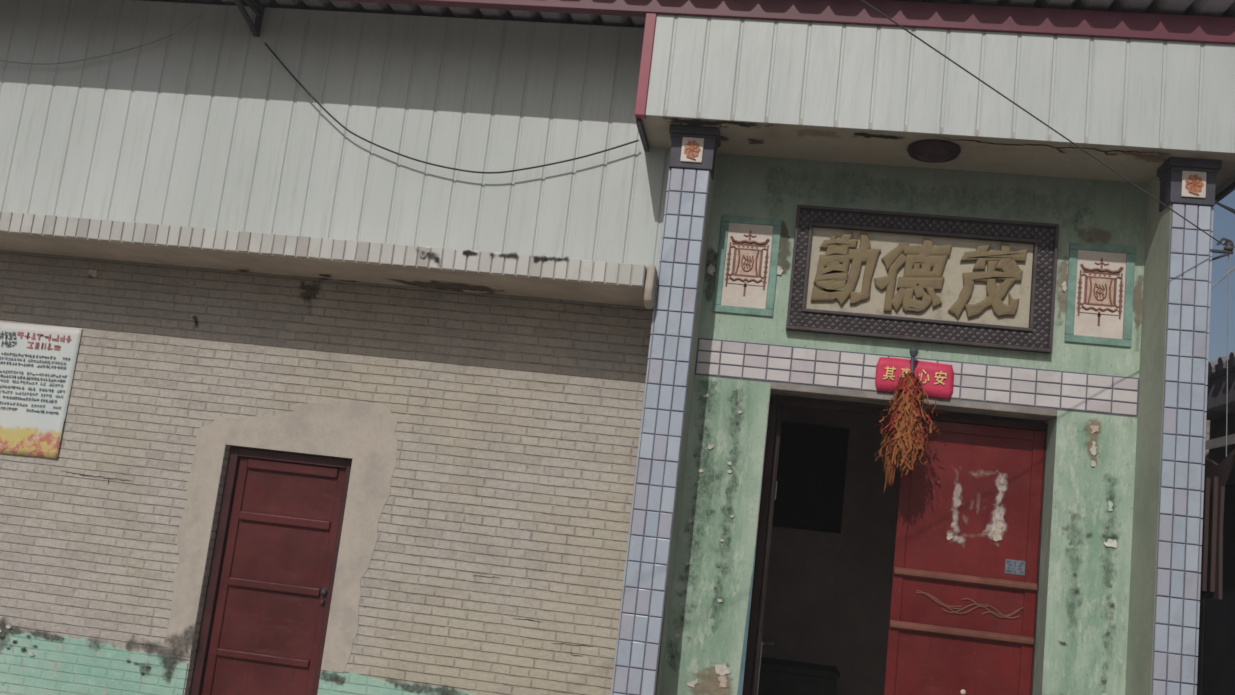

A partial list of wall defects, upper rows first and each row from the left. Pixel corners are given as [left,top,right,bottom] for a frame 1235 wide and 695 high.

spalling [463,250,518,259]
peeling [1084,420,1100,467]
leakage [669,381,742,667]
spalling [687,663,731,695]